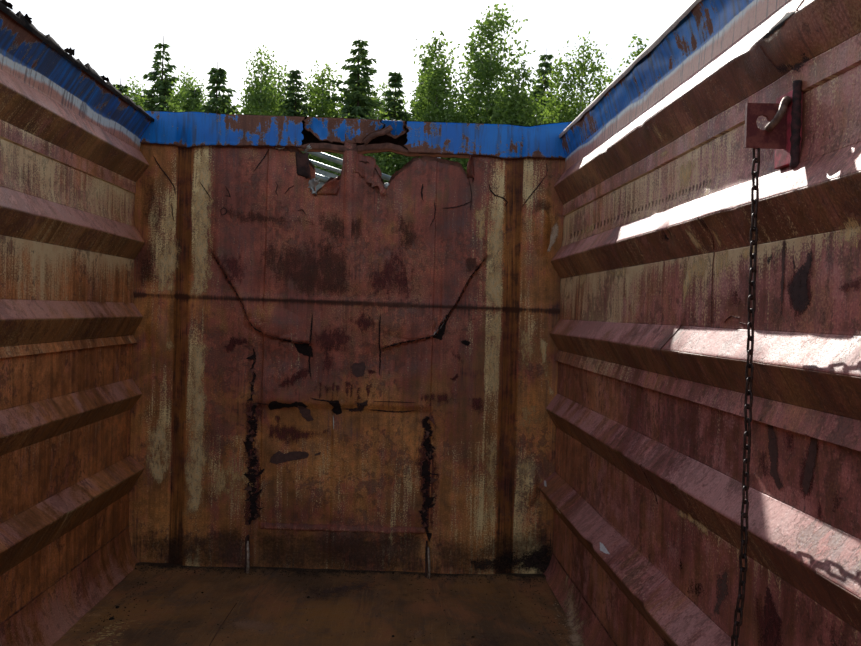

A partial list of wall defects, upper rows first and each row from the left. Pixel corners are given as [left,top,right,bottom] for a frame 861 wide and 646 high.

crack [214,257,313,526]
corrosion [315,314,375,399]
crack [378,258,485,375]
corrosion [787,249,812,322]
crack [312,398,439,542]
corrosion [759,419,794,490]
corrosion [799,434,818,497]